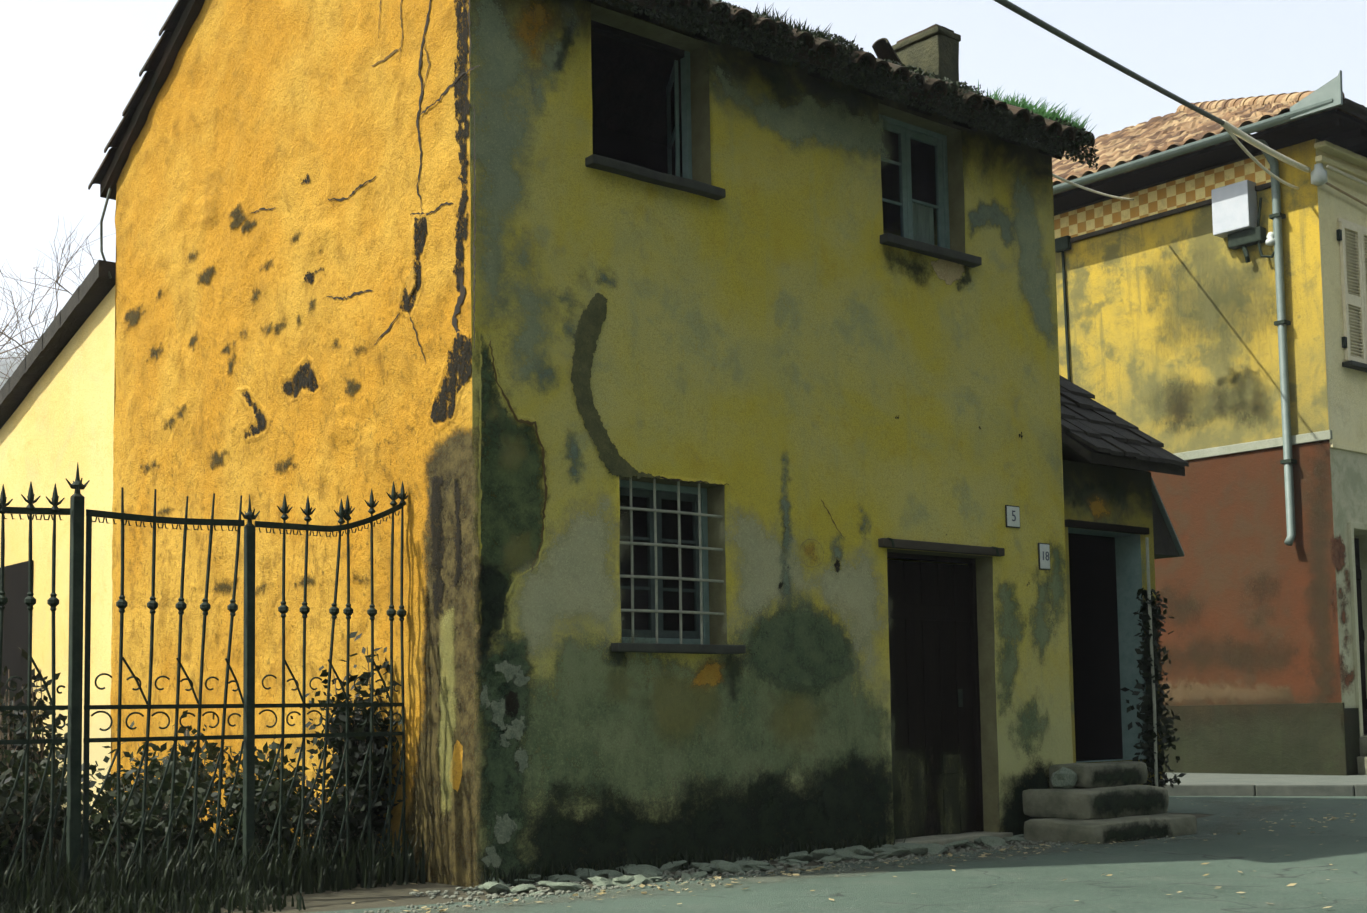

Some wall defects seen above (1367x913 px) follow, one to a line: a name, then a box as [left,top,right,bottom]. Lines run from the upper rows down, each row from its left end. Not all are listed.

spalling [189,251,216,285]
spalling [229,203,275,233]
spalling [221,250,324,444]
crack [326,289,373,300]
crack [328,176,376,201]
spalling [332,209,432,359]
crack [372,0,479,348]
damp [1152,266,1268,341]
damp [1154,373,1269,425]
flaking render [426,276,899,881]
damp [995,543,1067,836]
damp [518,755,903,876]